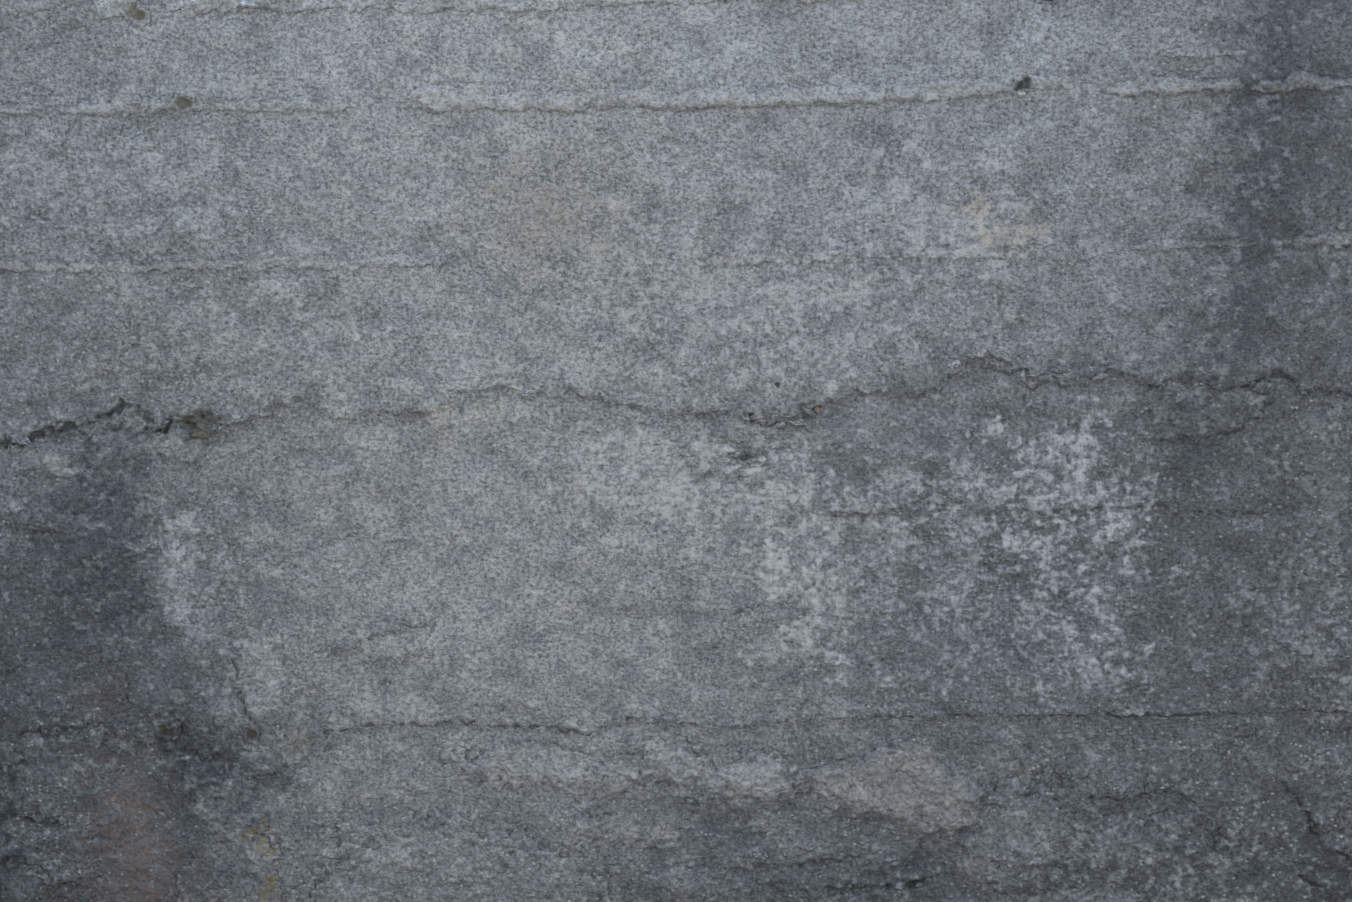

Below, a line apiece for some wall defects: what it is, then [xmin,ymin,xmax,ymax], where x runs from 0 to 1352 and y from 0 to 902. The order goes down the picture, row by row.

crack [0,347,1352,454]
water stain [0,89,424,902]
crack [688,468,746,478]
crack [224,649,255,725]
crack [243,708,1352,784]
crack [1078,788,1207,807]